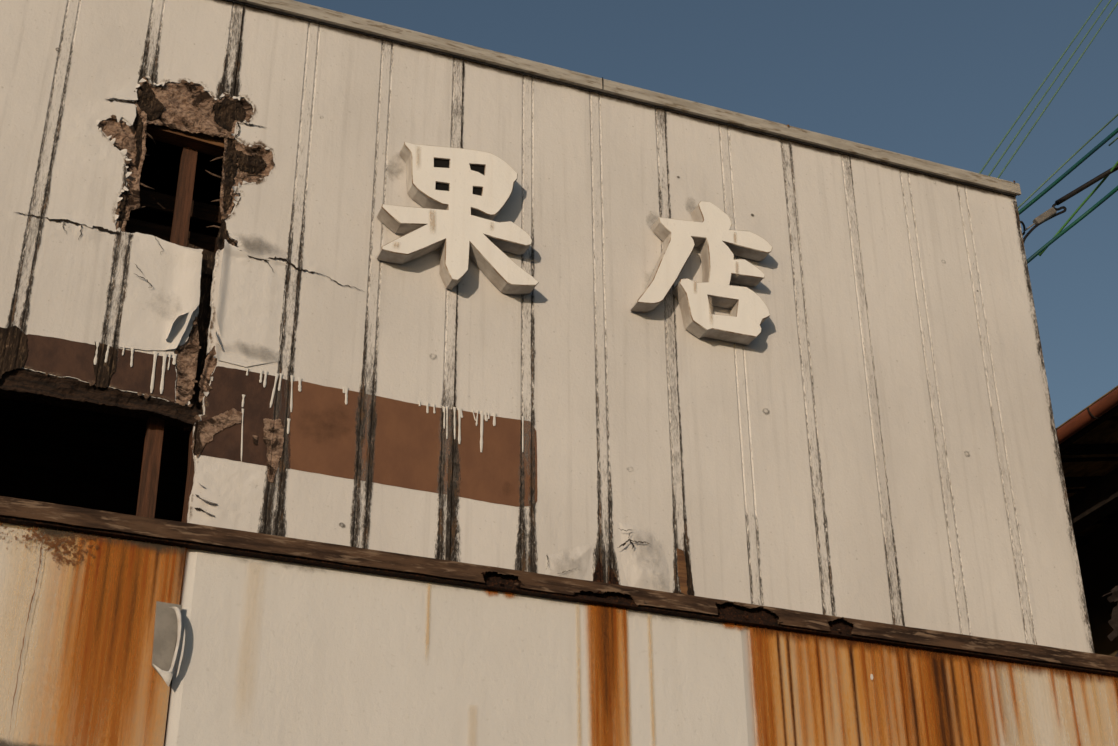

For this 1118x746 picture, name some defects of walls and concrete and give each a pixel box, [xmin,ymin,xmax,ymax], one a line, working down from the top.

water stain [137,0,165,84]
water stain [6,3,75,334]
crack [15,212,121,240]
water stain [102,231,133,356]
peeling [0,75,288,458]
crack [238,249,363,291]
water stain [214,0,1095,653]
peeling [252,418,284,482]
crack [617,528,649,548]
rust [0,521,186,746]
rust [579,594,630,746]
rust [721,604,1118,746]